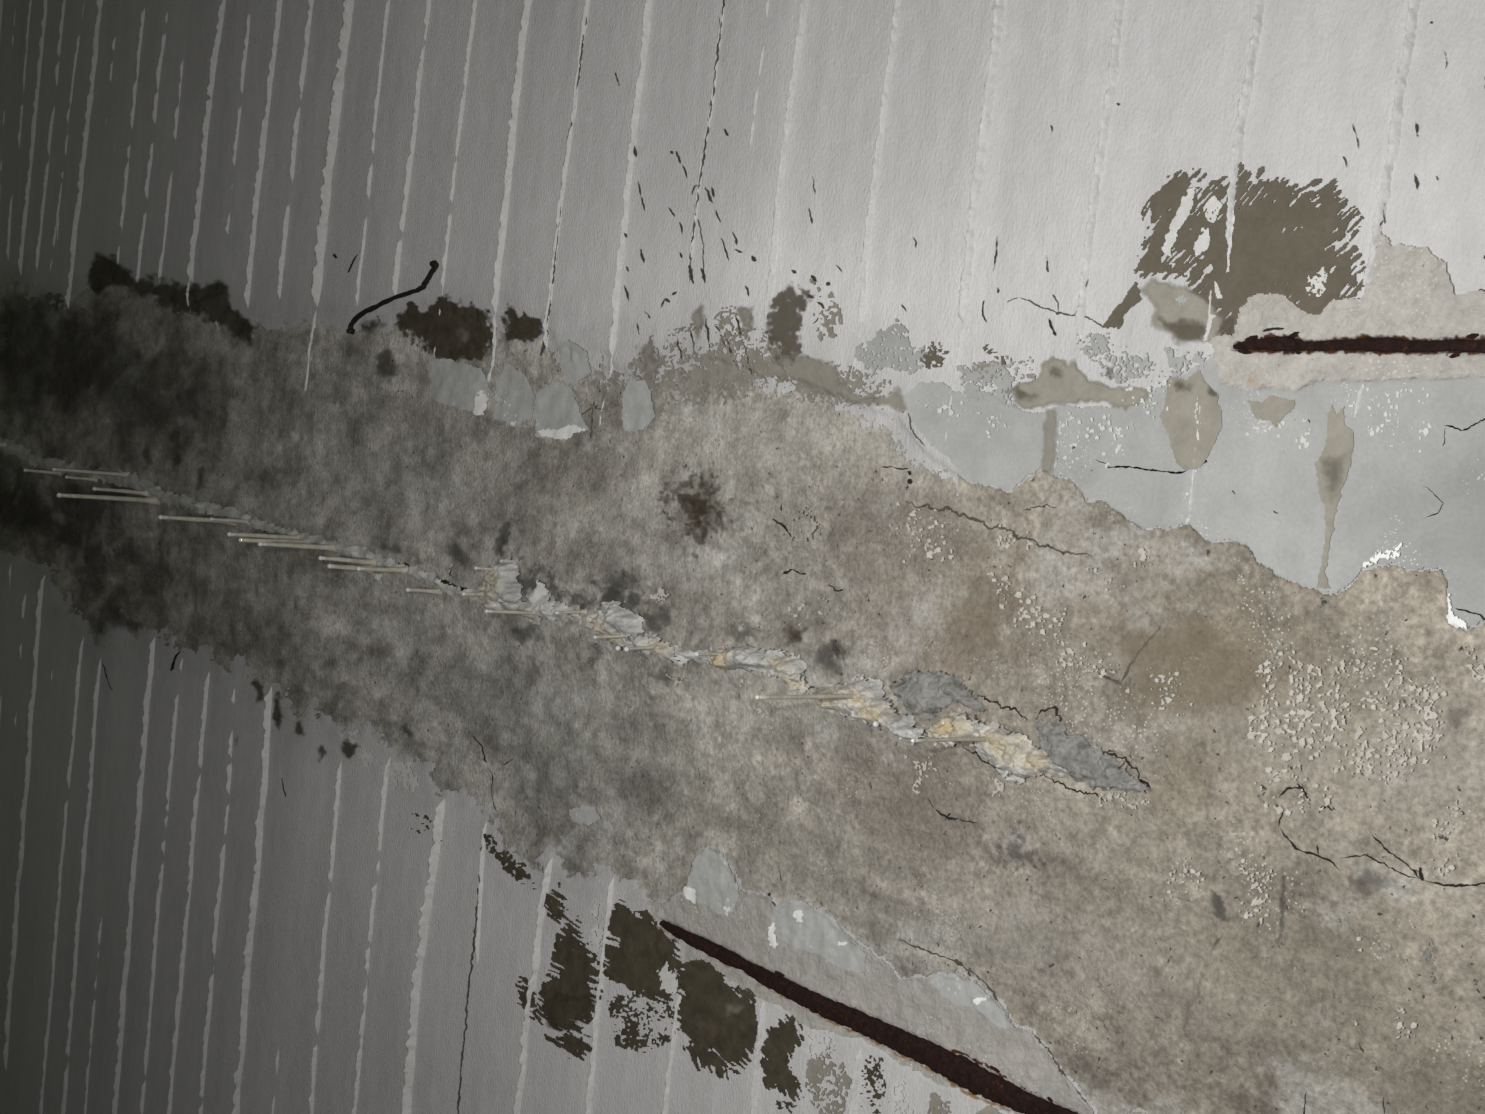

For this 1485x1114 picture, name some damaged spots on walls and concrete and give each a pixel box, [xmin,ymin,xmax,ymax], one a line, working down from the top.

peeling [705,187,756,262]
leakage [89,254,252,342]
leakage [1141,279,1232,341]
peeling [1134,162,1485,392]
corrosion [1233,332,1485,358]
crack [881,414,1092,558]
crack [773,503,842,592]
spalling [0,275,1485,1114]
crack [977,694,1062,721]
crack [1044,750,1151,802]
crack [1275,784,1485,887]
corrosion [659,920,1078,1114]